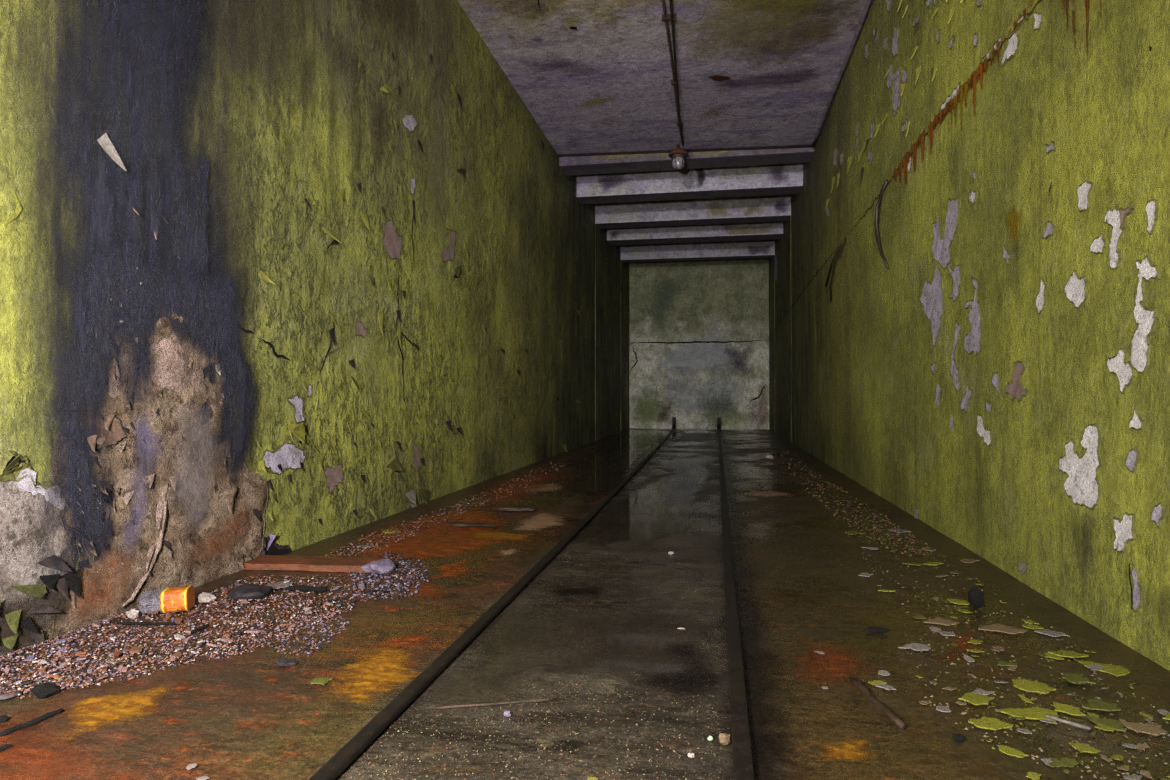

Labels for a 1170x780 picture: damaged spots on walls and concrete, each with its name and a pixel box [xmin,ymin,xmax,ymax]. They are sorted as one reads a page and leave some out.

water stain [704,0,843,87]
rust [894,1,1032,184]
rust [1063,0,1102,56]
crack [630,0,1042,371]
peeling [919,172,992,447]
peeling [1064,270,1087,309]
peeling [1089,199,1159,271]
peeling [1105,255,1161,394]
spalling [0,289,343,656]
peeling [1058,423,1102,510]
water stain [583,336,786,780]
peeling [1112,512,1143,613]